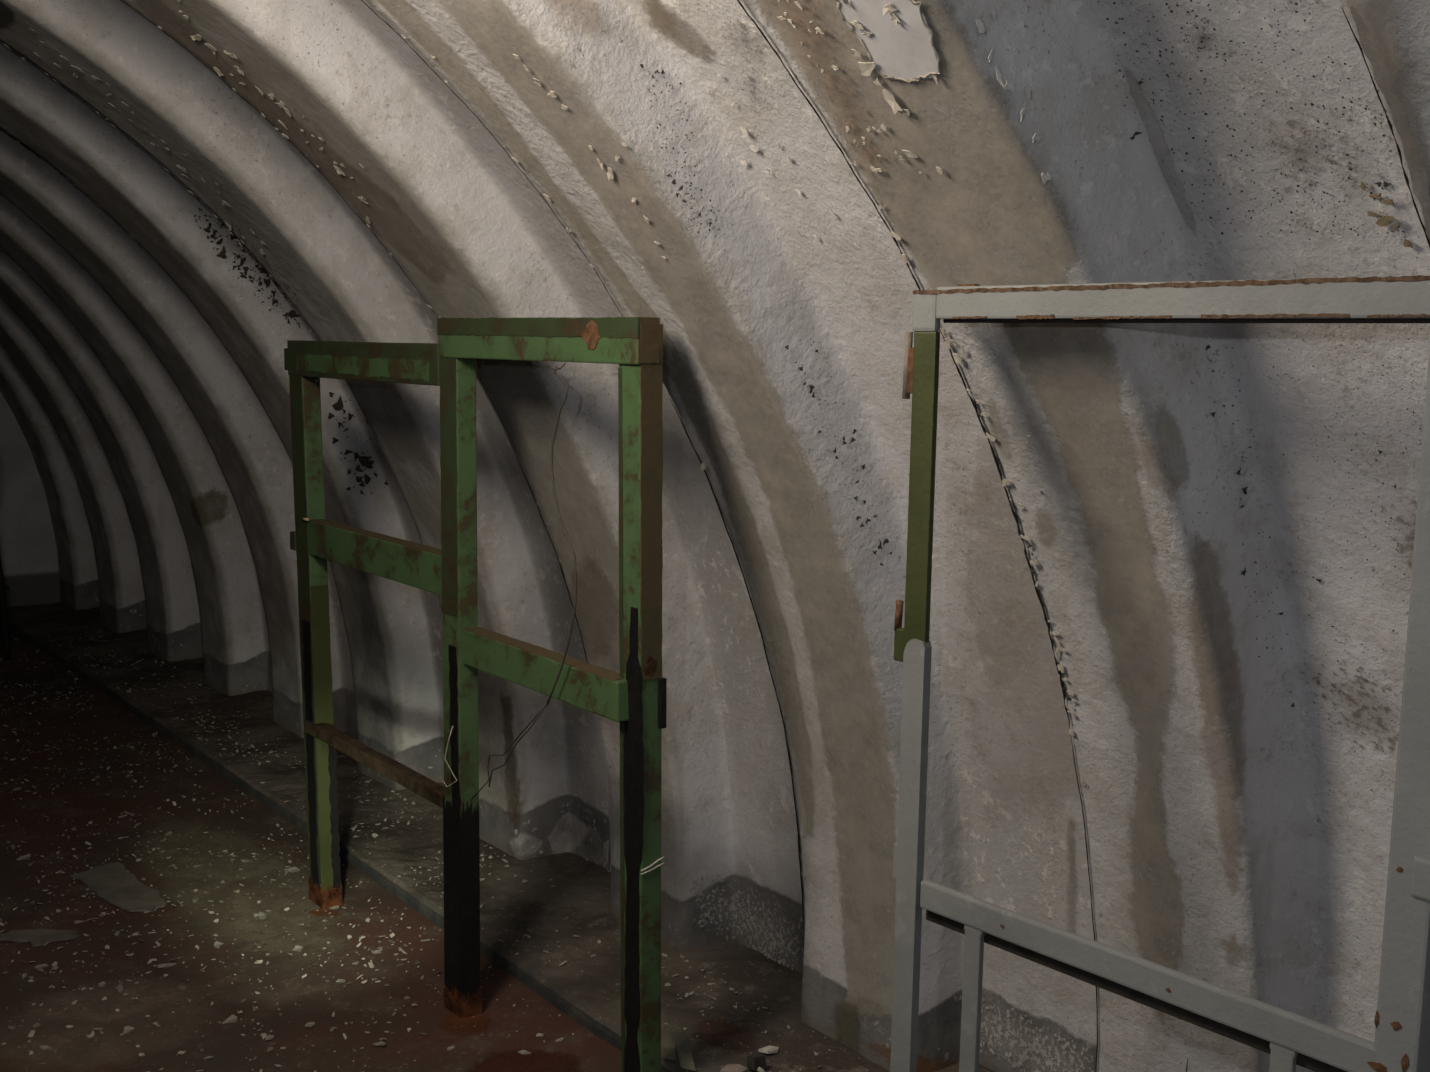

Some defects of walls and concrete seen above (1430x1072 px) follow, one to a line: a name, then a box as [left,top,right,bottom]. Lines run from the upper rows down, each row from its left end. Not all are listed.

leakage [333,174,468,318]
leakage [379,0,896,1017]
leakage [723,0,1075,290]
leakage [1004,323,1182,970]